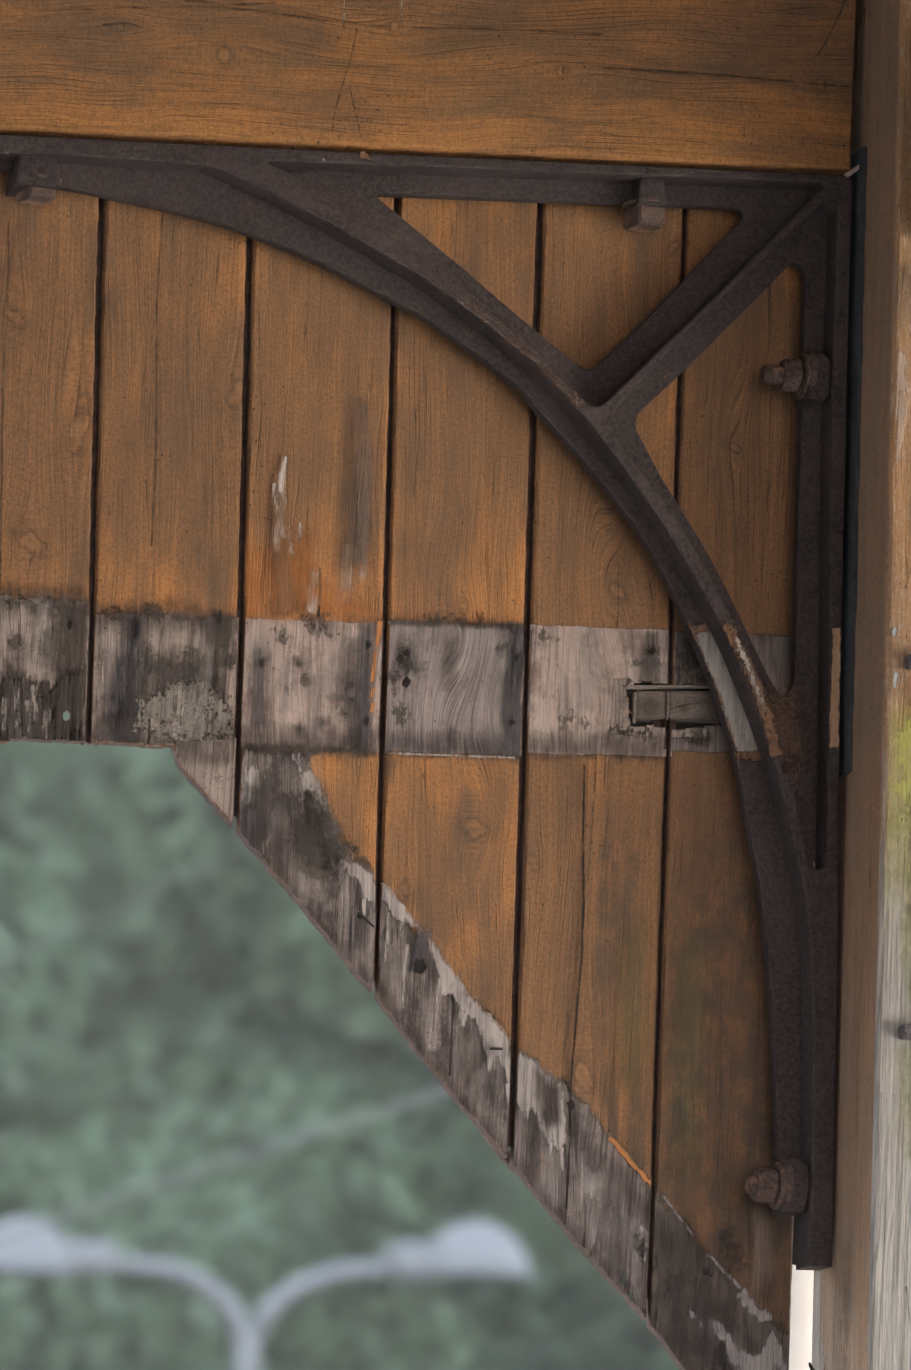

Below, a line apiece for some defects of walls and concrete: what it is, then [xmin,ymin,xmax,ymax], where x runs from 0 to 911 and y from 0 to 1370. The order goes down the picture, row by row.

water stain [272,456,321,616]
water stain [52,604,87,742]
water stain [102,613,146,741]
water stain [206,610,232,725]
corrosion [688,622,783,762]
water stain [284,786,567,1171]
water stain [628,1221,648,1264]
water stain [718,1208,775,1287]
water stain [689,1309,788,1370]